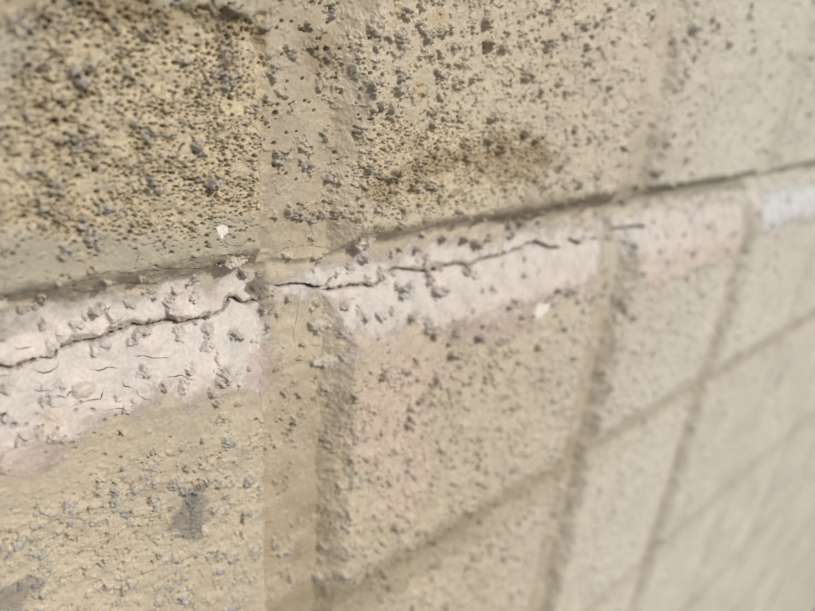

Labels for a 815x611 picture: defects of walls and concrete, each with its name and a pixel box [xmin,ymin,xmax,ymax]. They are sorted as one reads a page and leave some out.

spalling [0,0,273,243]
crack [0,239,245,299]
crack [264,224,645,319]
crack [0,292,258,411]